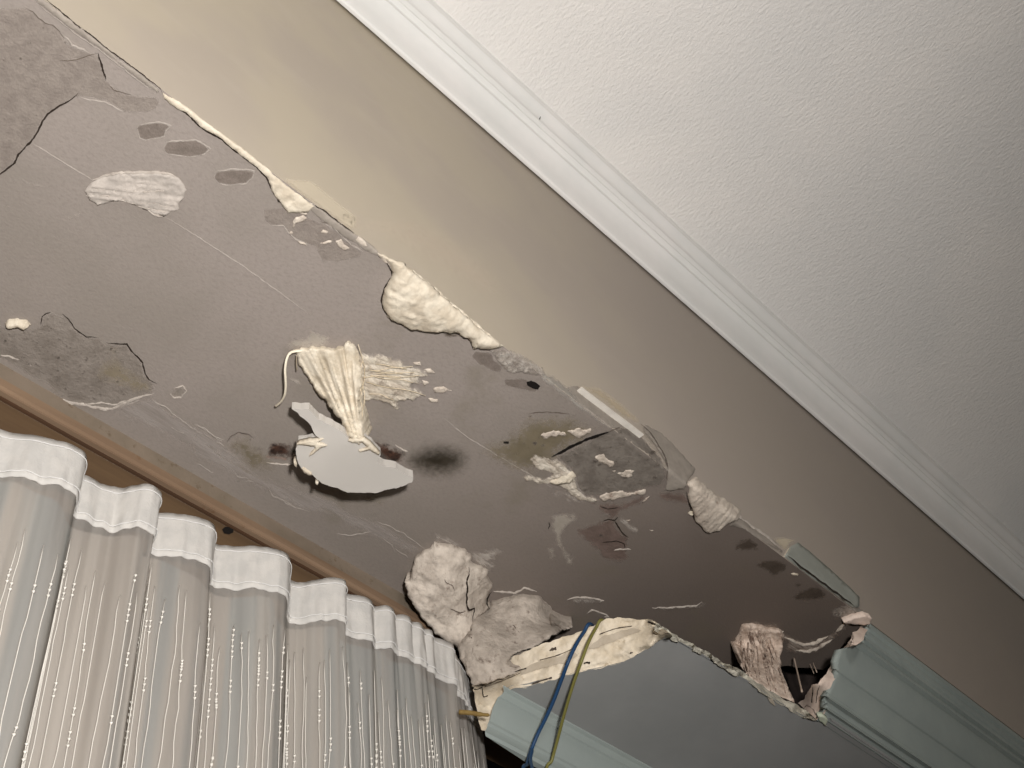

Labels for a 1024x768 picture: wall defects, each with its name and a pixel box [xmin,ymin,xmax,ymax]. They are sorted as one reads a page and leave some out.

peeling [0,0,211,175]
peeling [214,168,255,186]
water stain [491,412,586,467]
spalling [473,349,786,575]
crack [444,571,492,639]
spalling [833,605,872,648]
spalling [472,617,835,731]